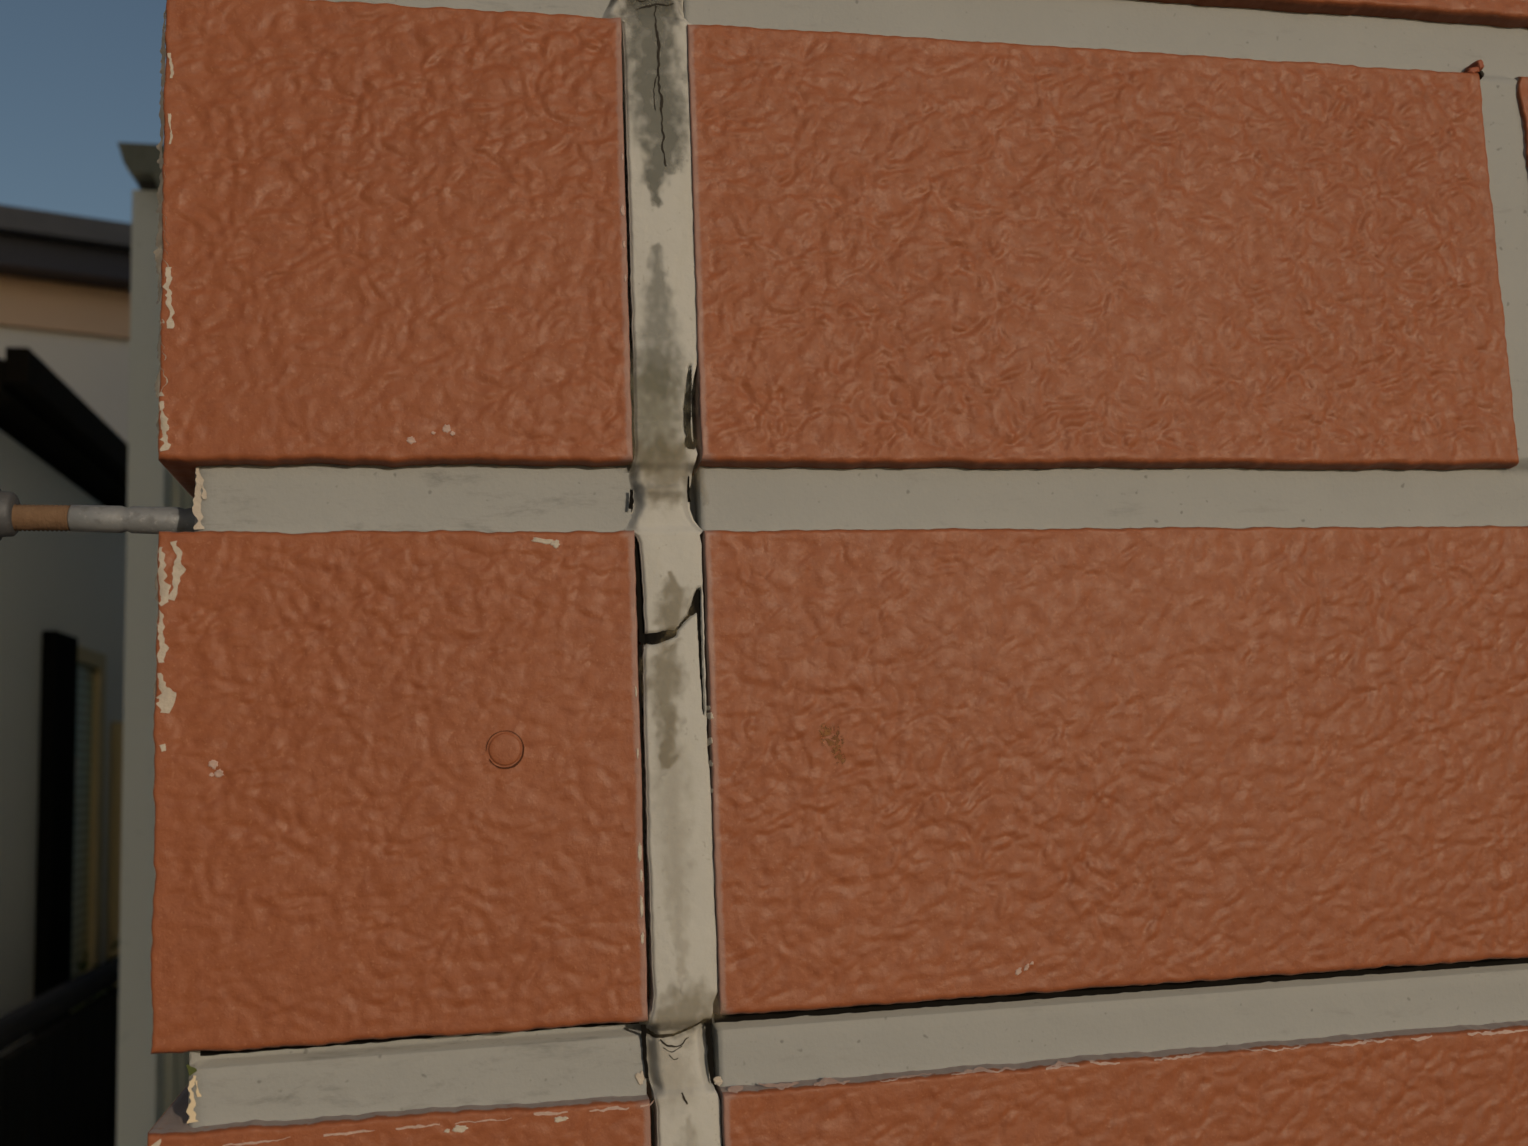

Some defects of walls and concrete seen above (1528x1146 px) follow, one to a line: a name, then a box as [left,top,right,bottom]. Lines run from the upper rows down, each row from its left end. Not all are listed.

leakage [626,0,683,206]
peeling [153,10,175,451]
peeling [192,467,207,530]
crack [621,0,714,1146]
peeling [153,541,186,713]
peeling [186,1064,202,1123]
peeling [223,1137,288,1146]
peeling [396,1118,510,1133]
peeling [534,1111,569,1123]
peeling [589,1100,655,1112]
peeling [1046,1060,1120,1070]
peeling [1331,1038,1392,1047]